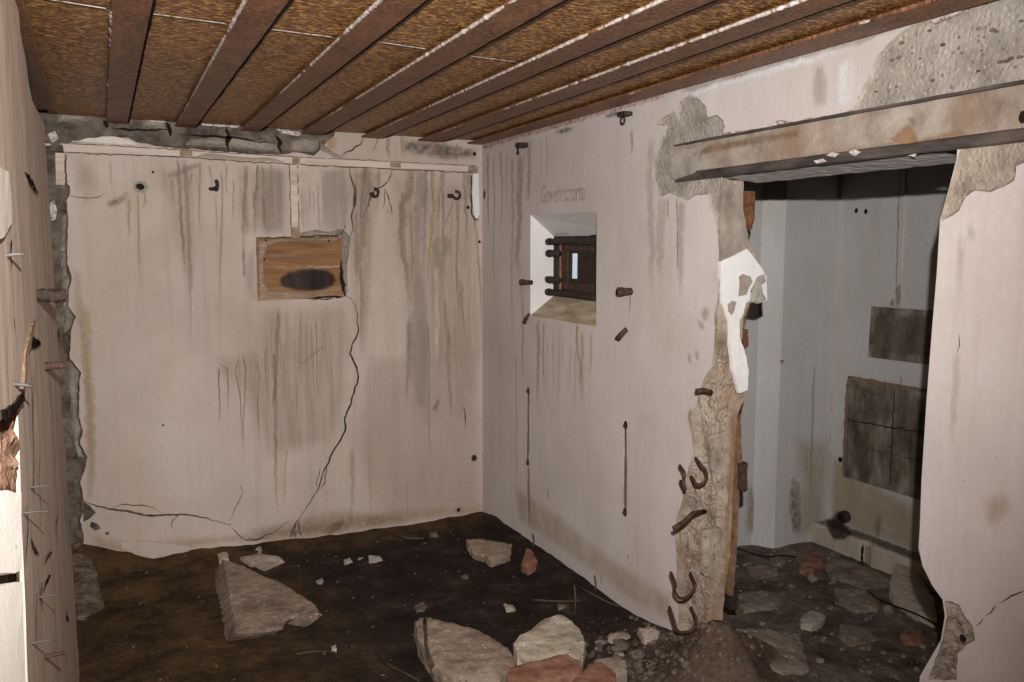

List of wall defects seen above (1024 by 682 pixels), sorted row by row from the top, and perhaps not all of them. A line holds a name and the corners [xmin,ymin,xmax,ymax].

spalling [843,0,1024,113]
spalling [941,142,1024,221]
spalling [37,109,350,559]
spalling [652,94,823,634]
spalling [0,412,20,493]
crack [26,297,359,629]
spalling [929,601,975,681]